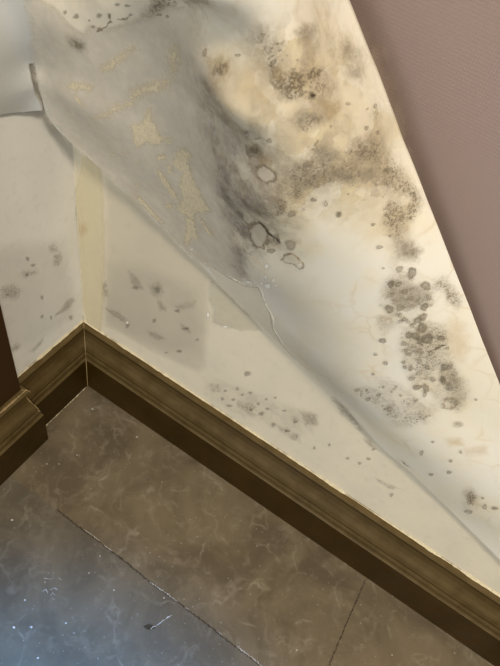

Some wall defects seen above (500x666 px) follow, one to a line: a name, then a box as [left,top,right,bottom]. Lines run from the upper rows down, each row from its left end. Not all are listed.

peeling [42,0,174,34]
damp [269,43,326,100]
damp [26,0,254,282]
damp [277,157,359,217]
damp [375,168,418,232]
damp [386,281,459,410]